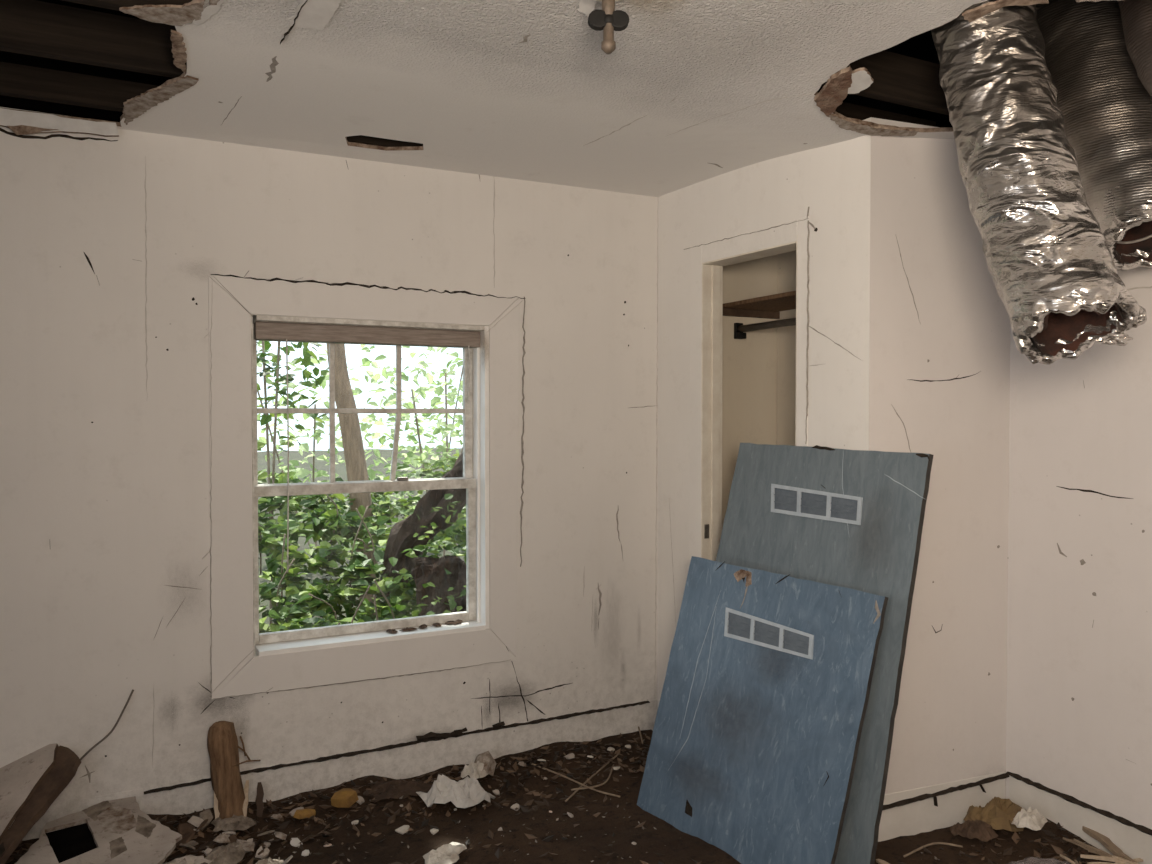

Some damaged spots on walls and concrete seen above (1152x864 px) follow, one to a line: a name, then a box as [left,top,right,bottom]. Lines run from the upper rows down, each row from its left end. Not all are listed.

spalling [0,0,227,141]
crack [265,0,308,82]
peeling [577,0,597,17]
spalling [814,66,920,137]
spalling [962,0,1049,23]
crack [211,175,526,567]
crack [198,316,650,775]
crack [144,688,211,794]